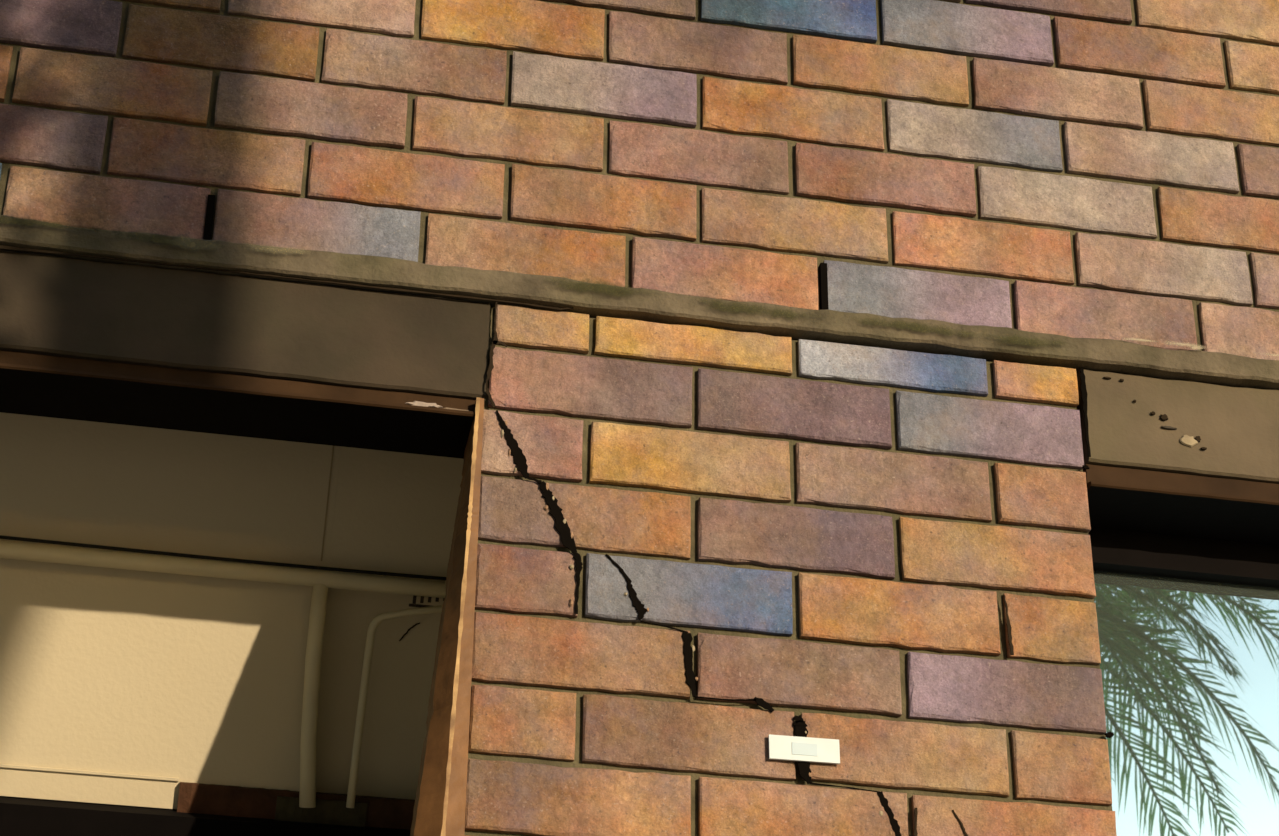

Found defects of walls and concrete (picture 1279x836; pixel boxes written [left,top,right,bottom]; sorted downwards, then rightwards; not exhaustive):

crack [0,245,918,836]
crack [952,809,968,836]